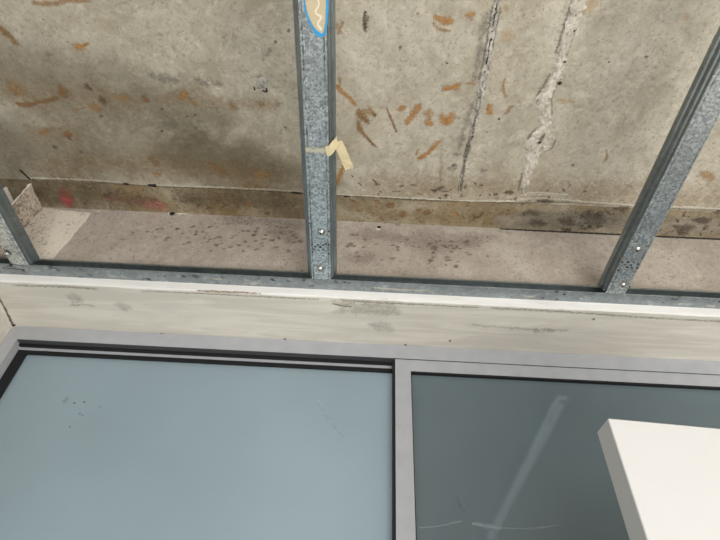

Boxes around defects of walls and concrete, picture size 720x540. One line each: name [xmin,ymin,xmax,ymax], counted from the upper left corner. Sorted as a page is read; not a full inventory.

leakage [495,200,630,232]
leakage [659,210,720,235]